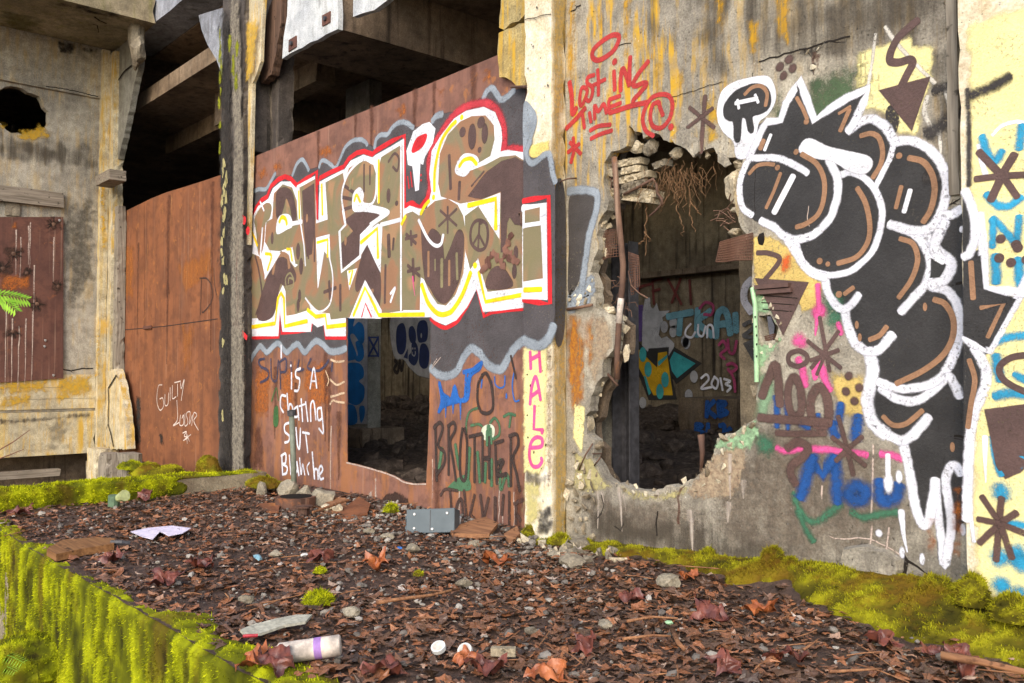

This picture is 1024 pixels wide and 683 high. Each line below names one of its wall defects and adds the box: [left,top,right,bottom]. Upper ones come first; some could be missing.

crack [752,36,850,77]
water stain [0,140,80,162]
peeling [670,128,700,158]
peeling [717,151,732,167]
water stain [53,203,94,302]
rust [2,276,28,290]
water stain [5,222,35,384]
spalling [574,443,609,492]
spalling [622,421,759,499]